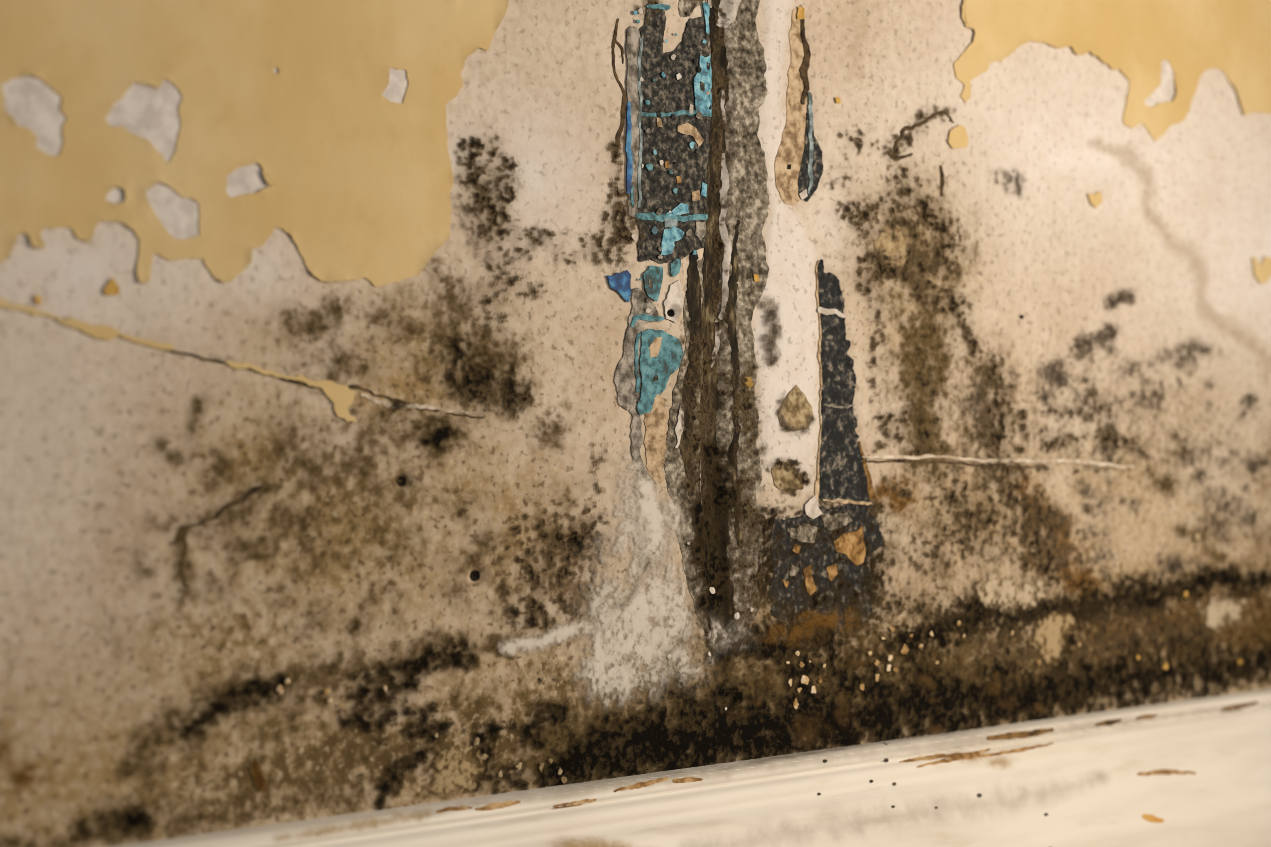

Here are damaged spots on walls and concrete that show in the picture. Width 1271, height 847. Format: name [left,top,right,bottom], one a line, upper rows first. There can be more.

peeling [953,0,1271,142]
peeling [0,0,509,287]
damp [838,129,880,160]
peeling [948,125,968,149]
peeling [103,278,120,295]
spalling [607,0,895,656]
crack [0,298,486,423]
crack [862,454,1135,468]
damp [53,165,1271,847]
spalling [786,651,826,709]
spalling [859,631,933,690]
damp [2,836,37,847]